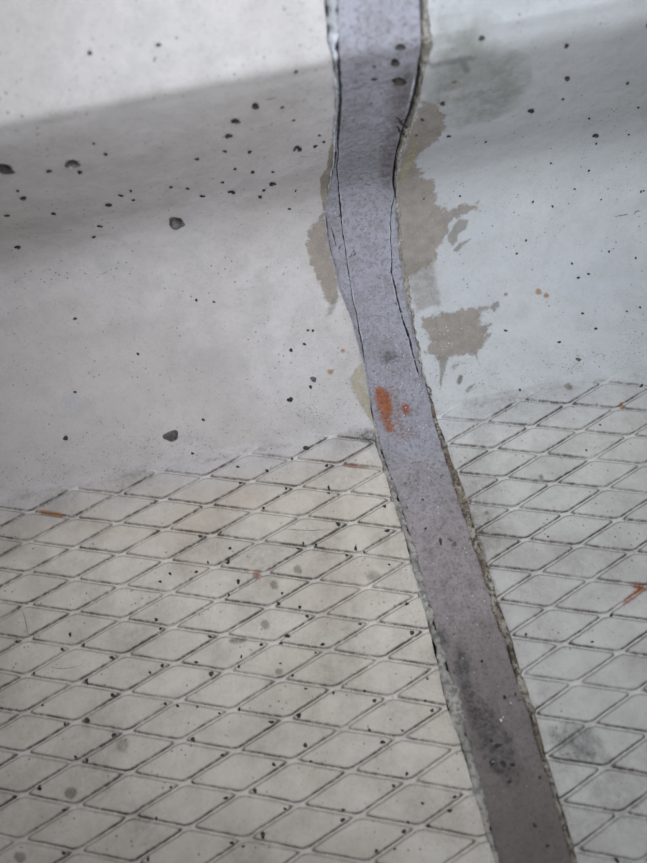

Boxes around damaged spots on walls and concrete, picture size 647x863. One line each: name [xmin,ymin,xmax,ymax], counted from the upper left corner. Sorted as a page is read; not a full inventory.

damp [306,213,337,303]
crack [326,47,420,380]
damp [397,102,478,277]
damp [422,302,498,381]
rust [376,389,393,430]